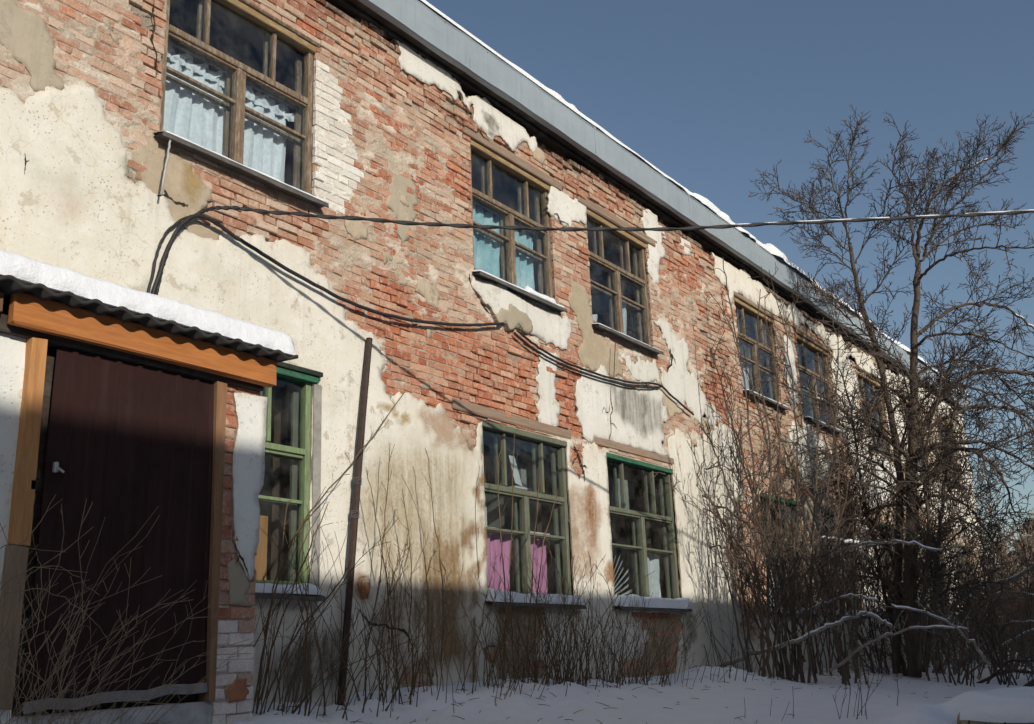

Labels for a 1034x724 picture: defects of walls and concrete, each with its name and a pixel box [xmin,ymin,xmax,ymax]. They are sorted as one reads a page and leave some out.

spalling [0,0,230,240]
leakage [368,467,488,679]
leakage [421,412,473,448]
spalling [307,40,771,642]
leakage [571,491,600,574]